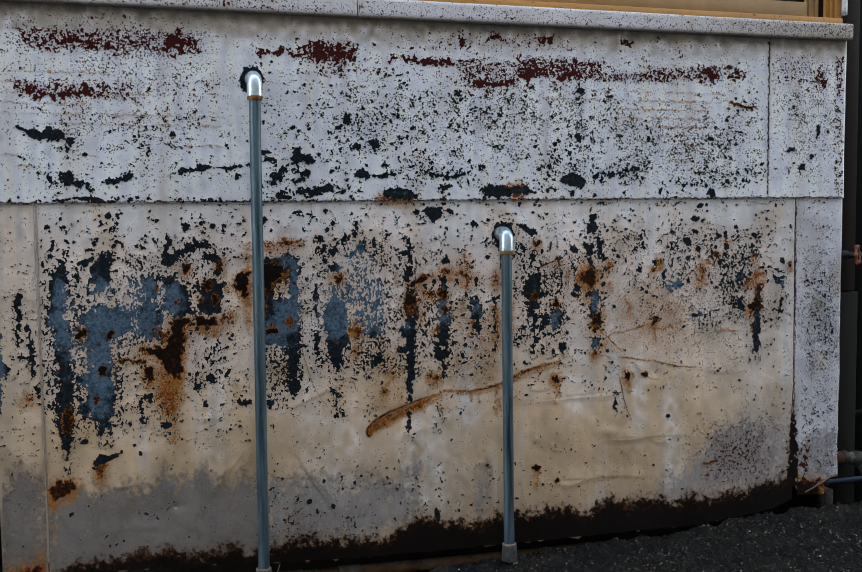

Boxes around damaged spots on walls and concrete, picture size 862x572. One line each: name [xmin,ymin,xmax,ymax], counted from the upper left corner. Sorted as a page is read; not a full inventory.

peeling [0,16,850,442]
corrosion [262,41,842,563]
corrosion [73,325,92,354]
peeling [0,217,253,482]
corrosion [97,243,253,443]
corrosion [60,406,76,434]
peeling [693,410,781,497]
peeling [798,436,817,478]
corrosion [44,478,84,513]
peeling [269,507,342,543]
corrosion [6,541,258,572]